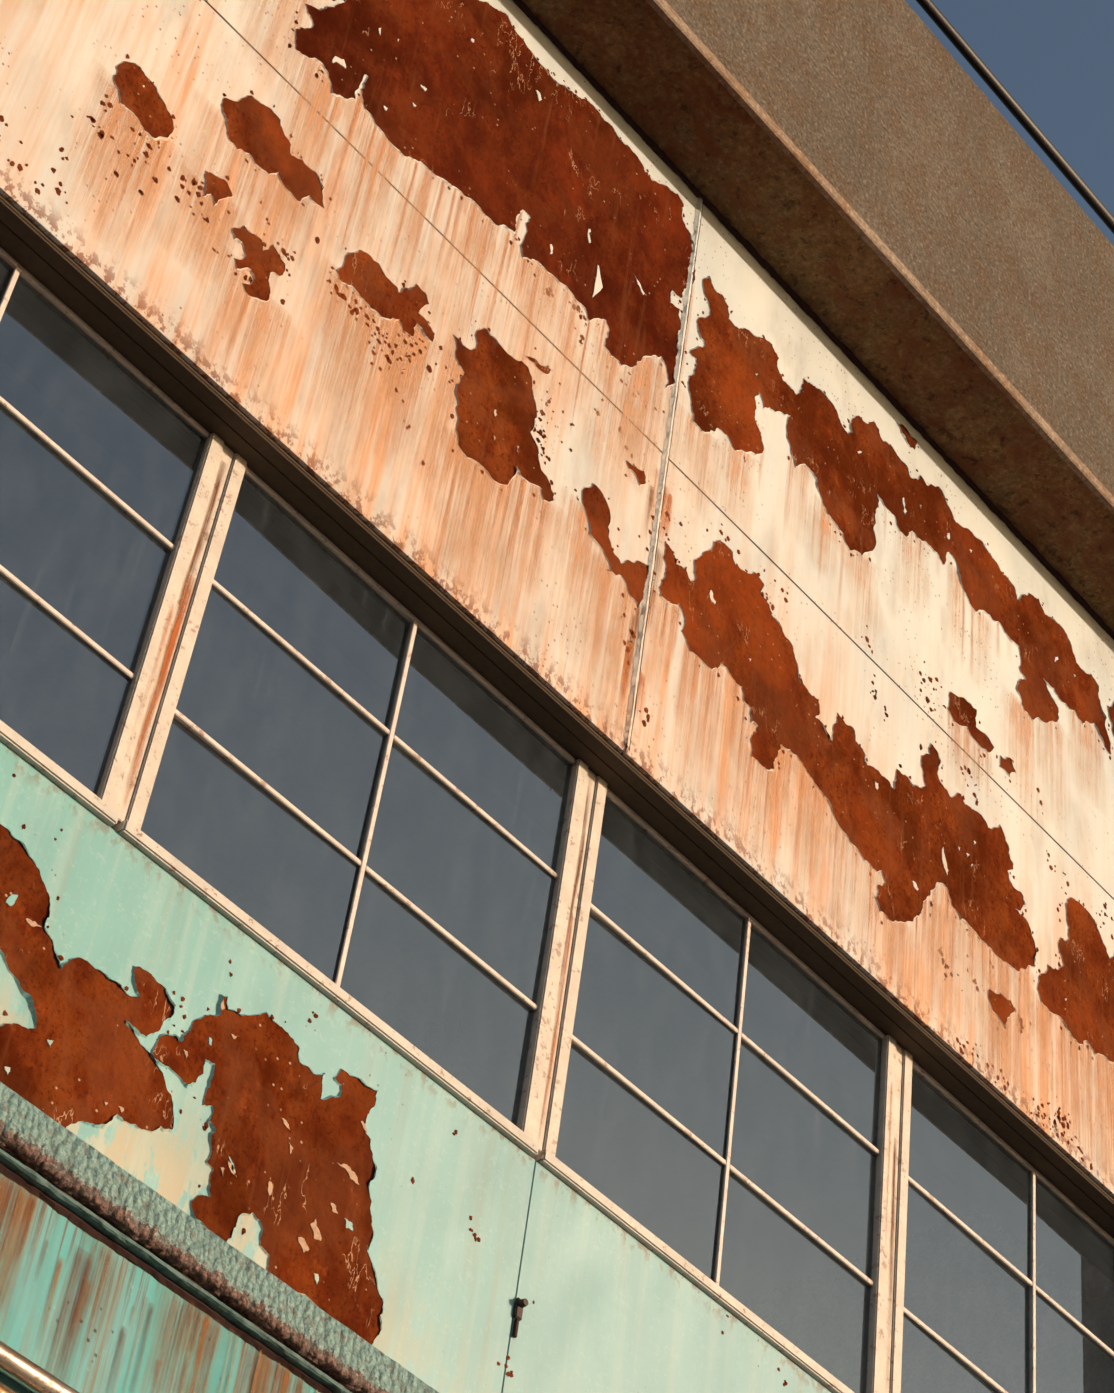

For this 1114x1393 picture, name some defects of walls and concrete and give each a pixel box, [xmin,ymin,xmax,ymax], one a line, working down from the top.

rust [7,147,69,204]
rust [71,0,1114,1091]
rust [0,823,384,1345]
rust [1031,1096,1093,1170]
rust [188,1315,215,1366]